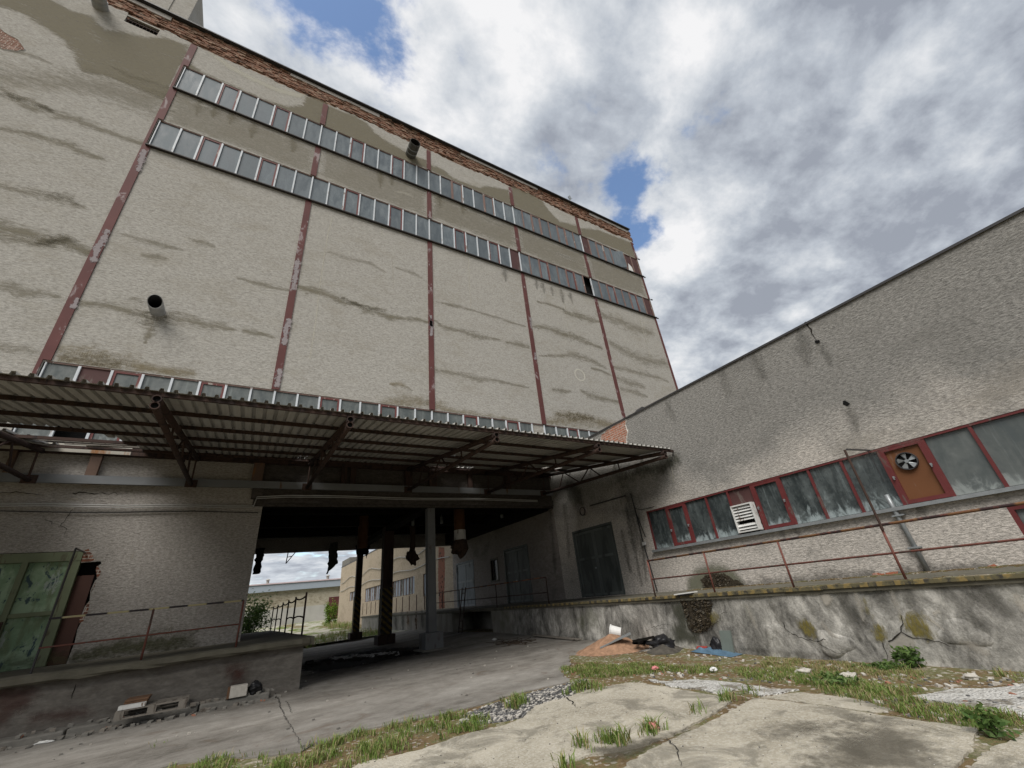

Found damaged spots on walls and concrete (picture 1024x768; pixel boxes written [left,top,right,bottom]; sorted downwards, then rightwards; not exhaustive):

water stain [0,0,202,99]
water stain [0,222,90,254]
crack [882,615,959,658]